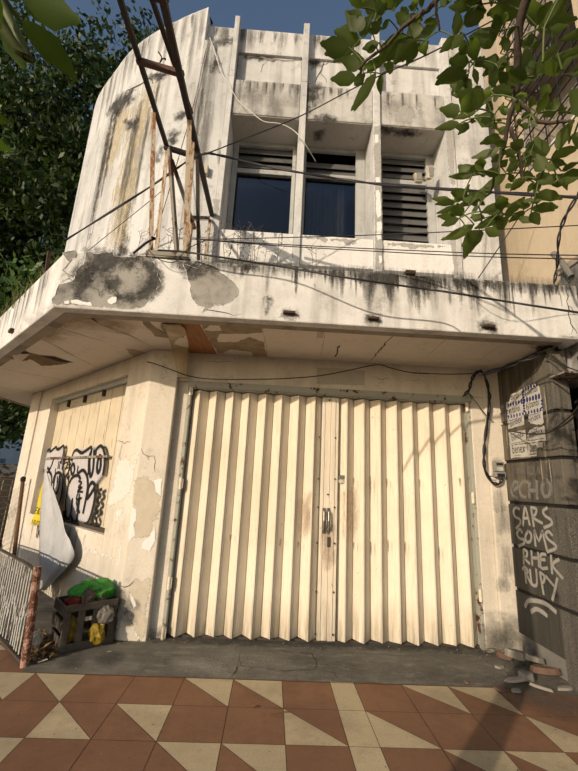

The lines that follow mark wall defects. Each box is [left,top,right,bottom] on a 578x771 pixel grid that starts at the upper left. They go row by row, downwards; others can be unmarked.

water stain [290,83,342,124]
water stain [91,78,159,254]
flaking render [52,248,164,310]
flaking render [179,261,240,316]
water stain [177,259,313,291]
water stain [325,268,578,306]
peeling [142,321,179,338]
peeling [202,325,268,357]
peeling [108,450,162,551]